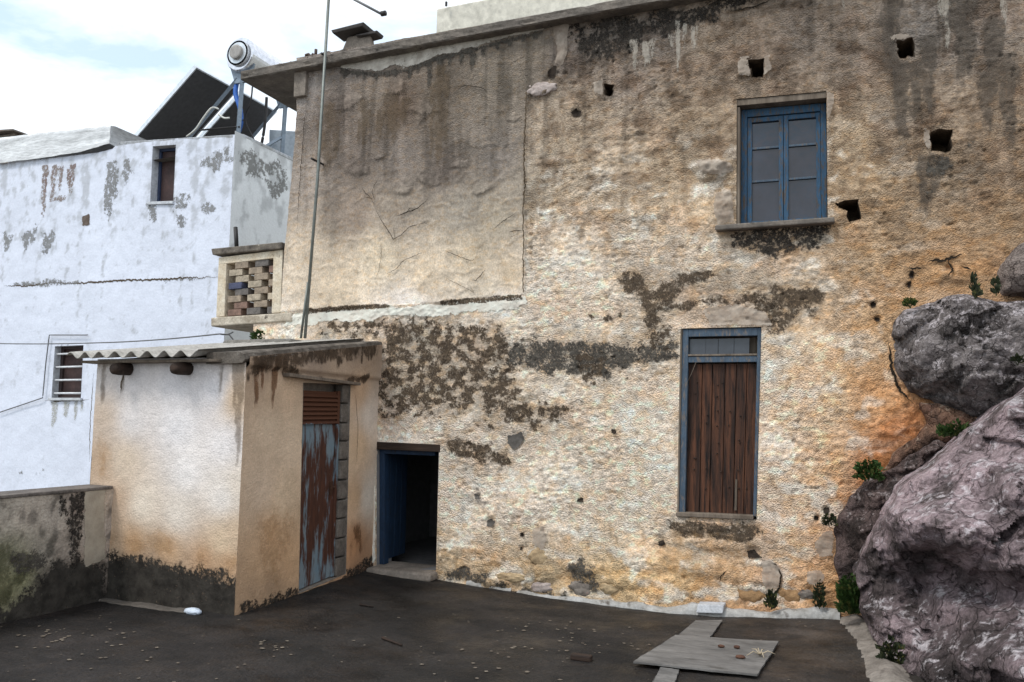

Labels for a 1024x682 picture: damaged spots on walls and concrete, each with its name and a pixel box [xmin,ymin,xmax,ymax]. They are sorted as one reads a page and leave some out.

damp [340,31,543,88]
peeling [3,163,76,254]
peeling [104,158,132,221]
peeling [173,193,191,228]
peeling [200,148,288,199]
crack [362,179,429,273]
damp [729,225,831,259]
crack [8,276,214,287]
damp [247,270,826,467]
crack [888,343,914,404]
damp [0,492,299,624]
damp [342,555,373,579]